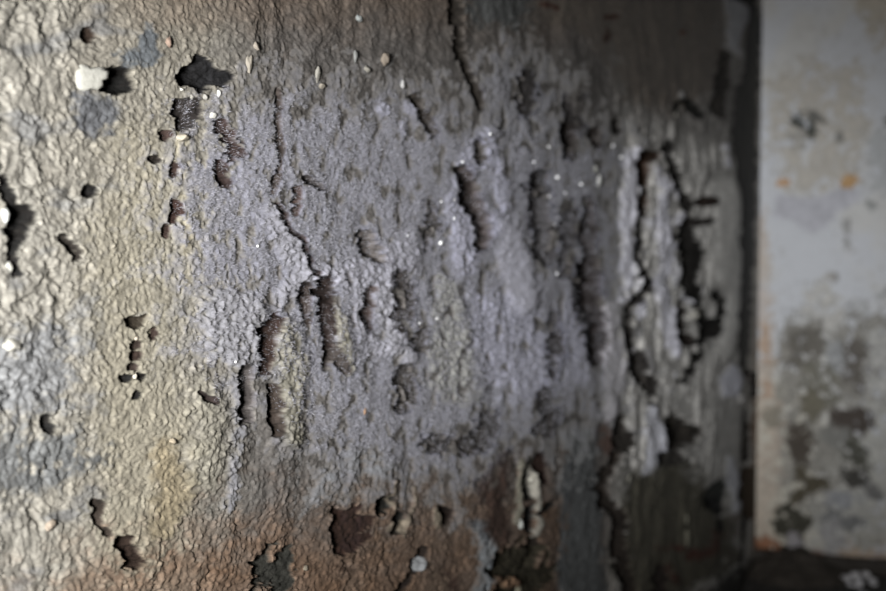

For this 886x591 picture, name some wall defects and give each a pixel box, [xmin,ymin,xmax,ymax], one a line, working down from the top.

leakage [108,20,167,73]
leakage [183,87,203,109]
crack [446,0,487,113]
peeling [615,144,699,361]
peeling [697,90,761,404]
leakage [217,389,268,515]
spalling [639,405,712,476]
leakage [757,269,886,556]
leakage [465,524,498,591]
leakage [613,452,755,591]